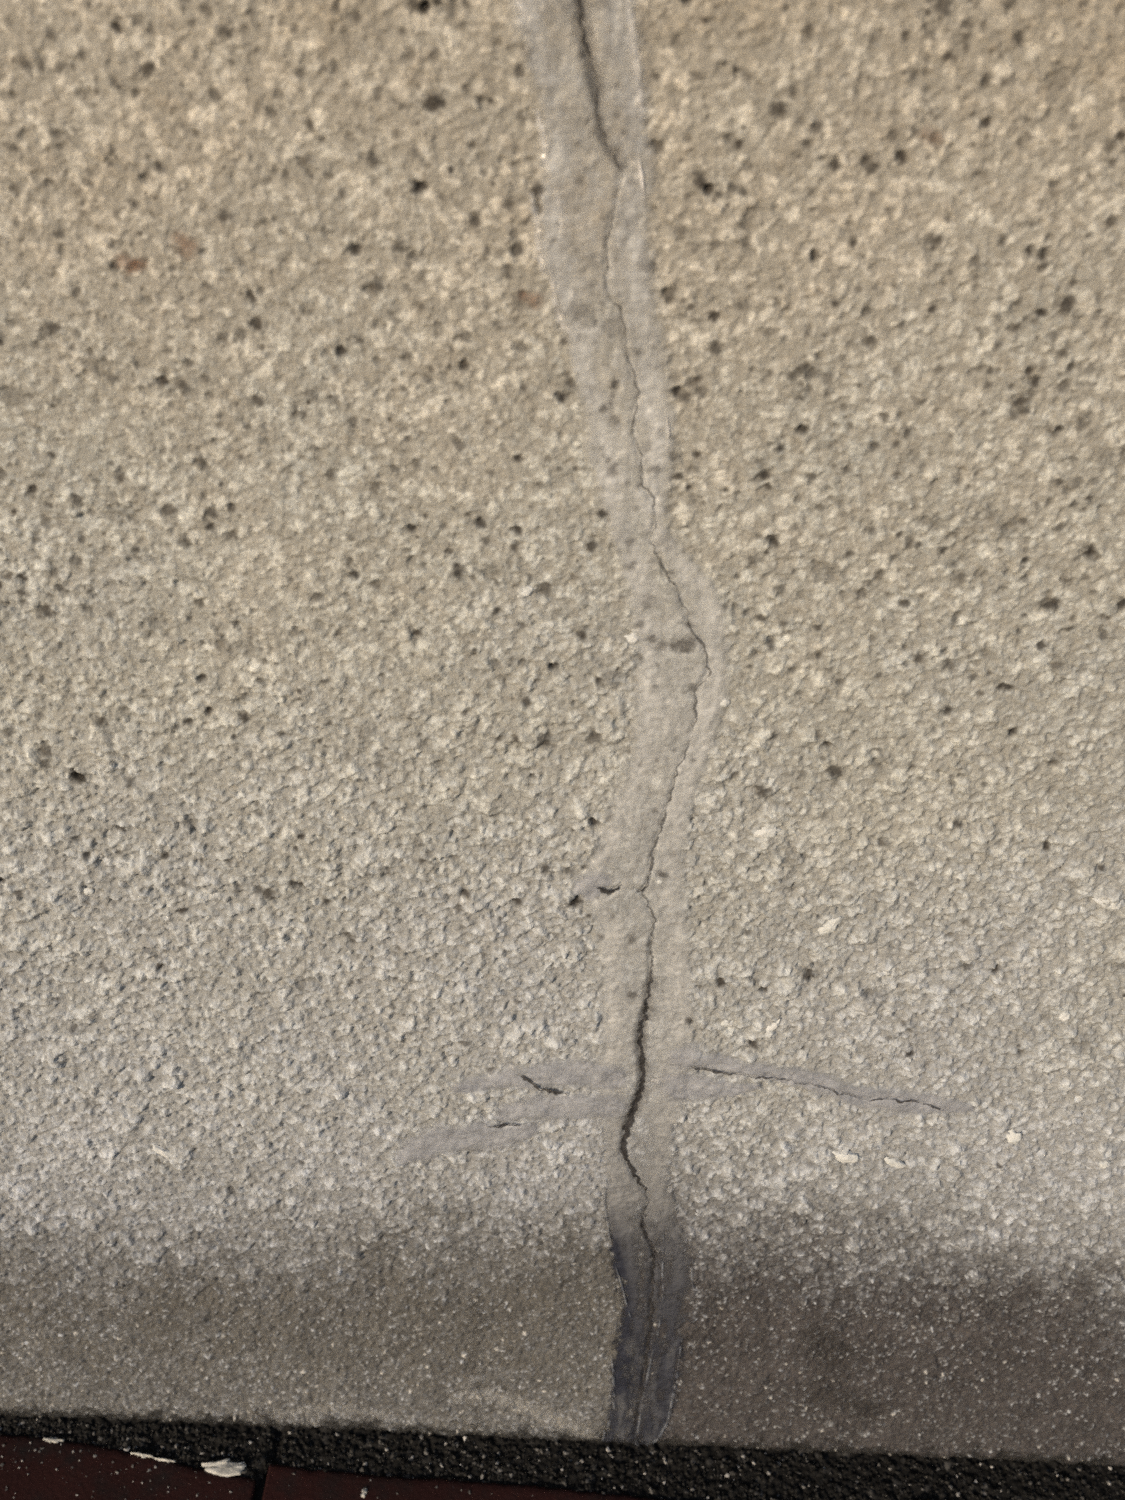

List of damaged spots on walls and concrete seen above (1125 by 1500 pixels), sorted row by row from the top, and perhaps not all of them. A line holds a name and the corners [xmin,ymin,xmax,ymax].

crack [577,0,711,1435]
crack [521,1076,567,1095]
crack [692,1067,940,1110]